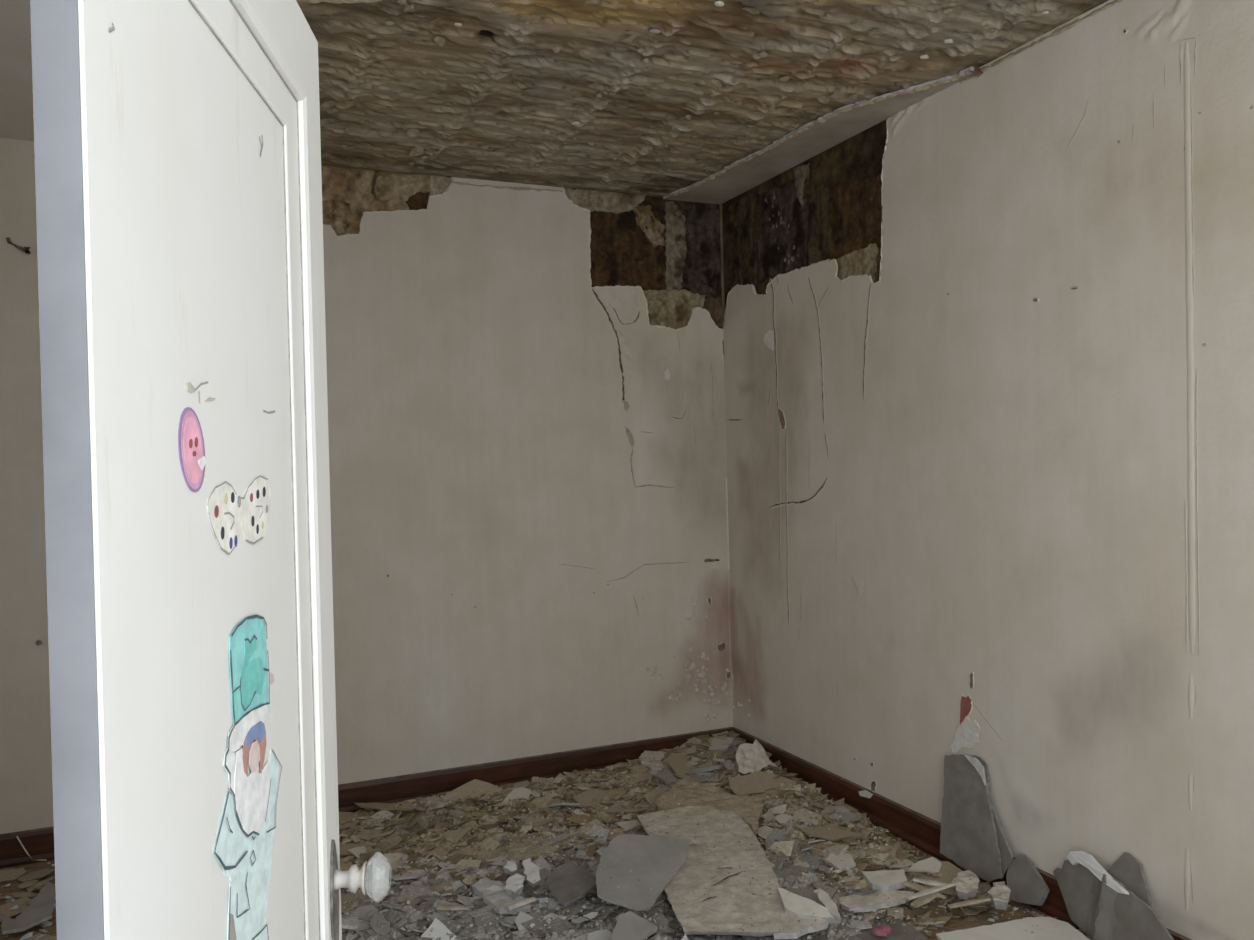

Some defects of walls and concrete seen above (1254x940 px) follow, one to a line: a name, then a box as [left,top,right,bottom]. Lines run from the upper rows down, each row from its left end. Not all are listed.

spalling [556,119,888,331]
crack [591,288,686,490]
crack [769,276,829,626]
crack [862,283,872,400]
crack [558,561,688,616]
spalling [951,694,980,755]